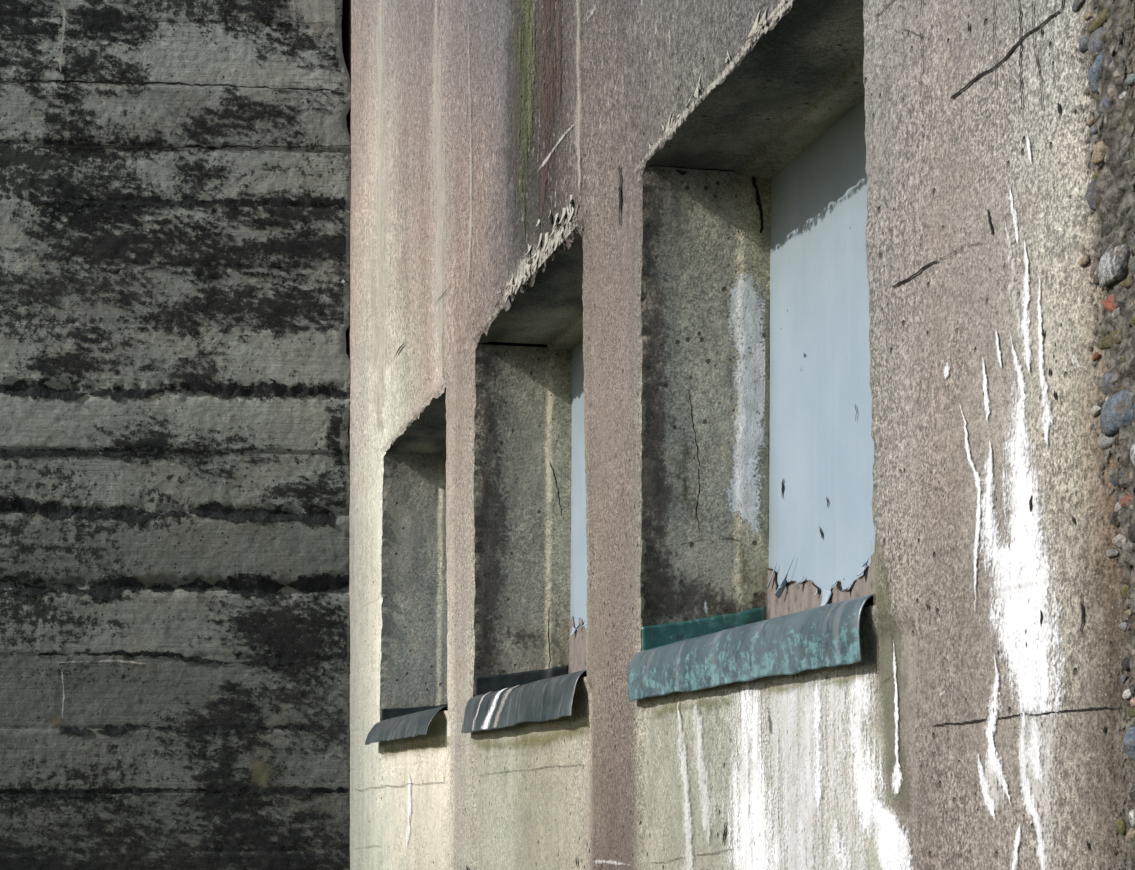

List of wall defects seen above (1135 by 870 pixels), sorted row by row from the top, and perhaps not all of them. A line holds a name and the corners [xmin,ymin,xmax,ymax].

damp [0,0,346,399]
spalling [469,195,582,342]
crack [892,243,980,288]
crack [950,0,1063,110]
damp [0,577,348,870]
crack [681,394,740,545]
damp [723,270,765,568]
damp [655,576,913,870]
peeling [767,553,876,620]
damp [960,185,1064,870]
crack [932,705,1125,726]
spalling [1057,0,1135,870]